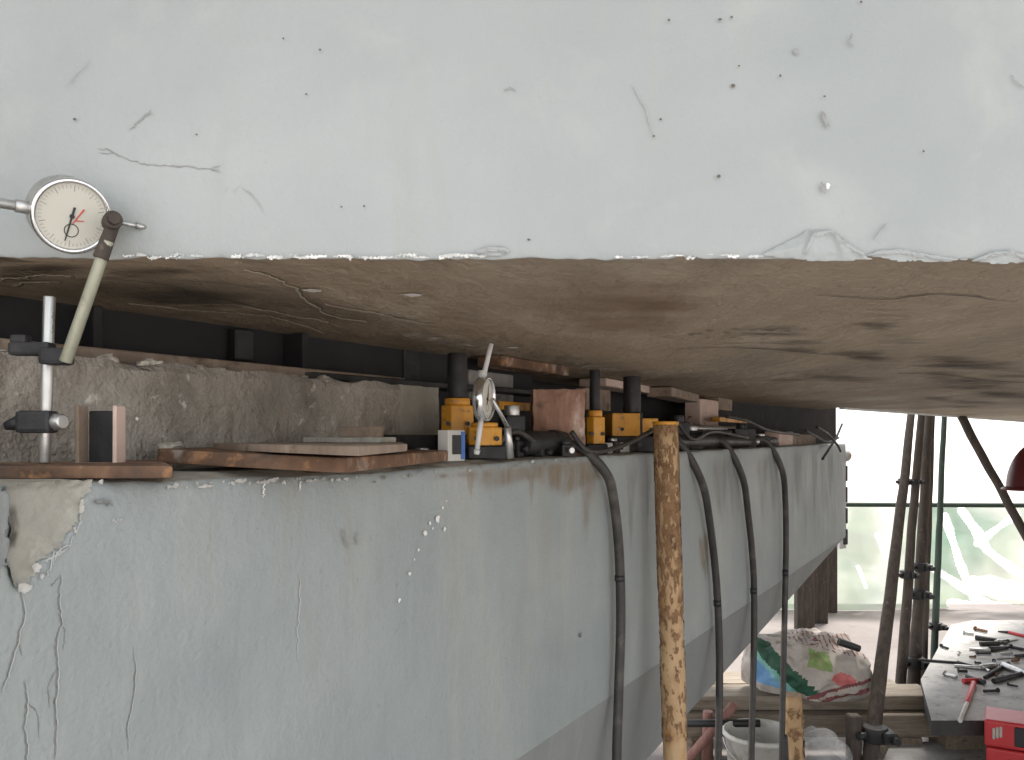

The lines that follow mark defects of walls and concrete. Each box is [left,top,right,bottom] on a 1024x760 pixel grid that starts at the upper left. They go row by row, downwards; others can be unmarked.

crack [99,148,221,172]
crack [819,294,1016,302]
spalling [0,479,113,595]
crack [1,576,65,760]